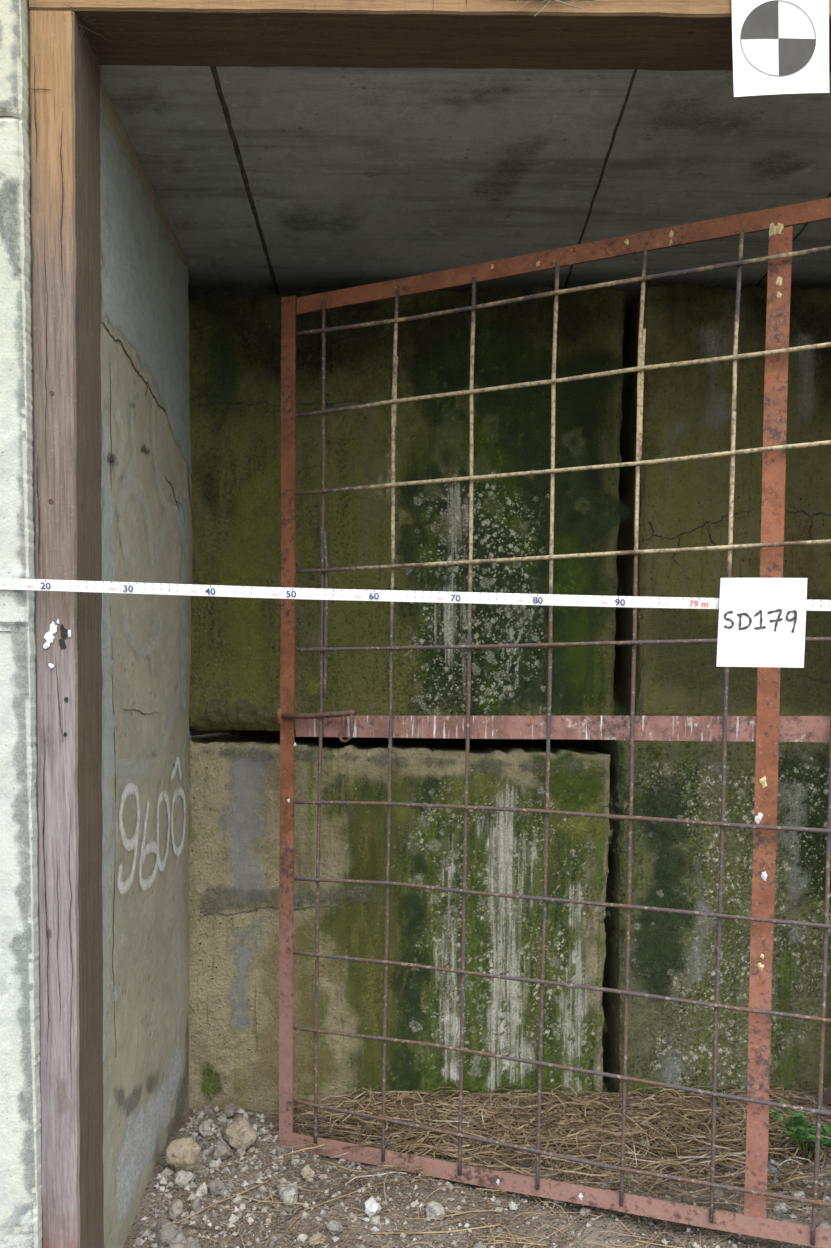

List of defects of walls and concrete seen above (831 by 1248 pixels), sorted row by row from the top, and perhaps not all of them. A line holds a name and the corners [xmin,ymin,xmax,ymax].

leakage [447,481,469,560]
crack [640,503,831,568]
leakage [434,577,466,666]
leakage [503,604,528,689]
leakage [435,859,460,1084]
leakage [478,784,537,1093]
leakage [559,883,589,1096]